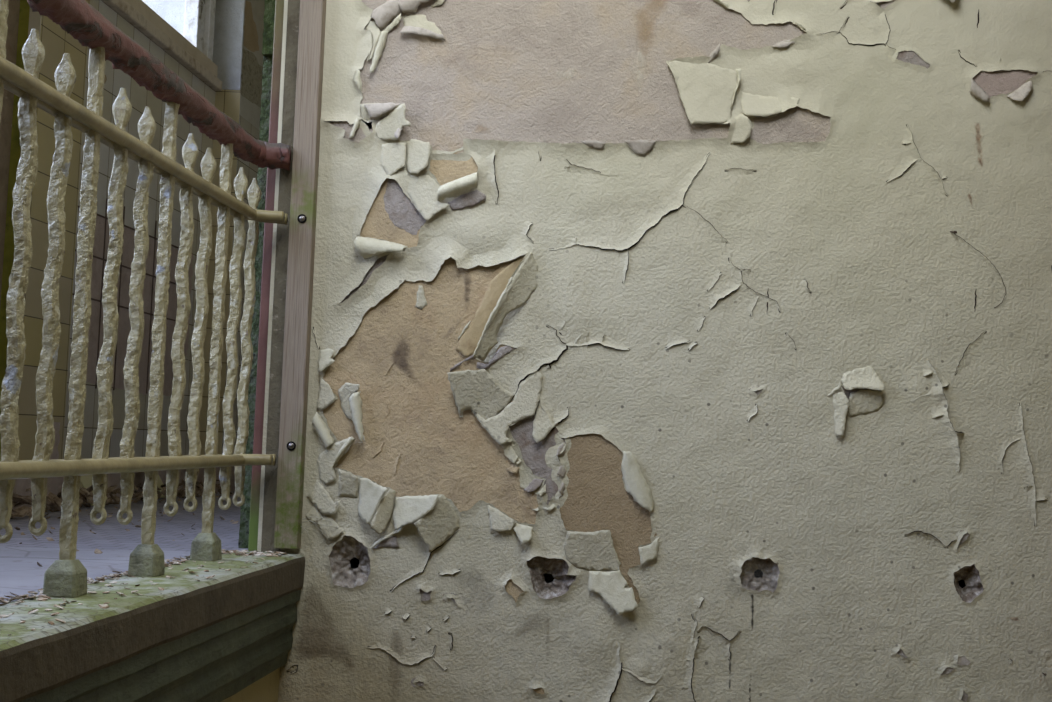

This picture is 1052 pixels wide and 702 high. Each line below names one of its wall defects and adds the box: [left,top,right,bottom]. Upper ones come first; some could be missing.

peeling [962,57,1046,109]
crack [886,124,948,197]
peeling [306,0,843,616]
peeling [828,366,885,437]
crack [911,291,987,472]
crack [991,403,1048,526]
peeling [384,568,465,650]
crack [587,595,741,702]
crack [904,531,957,550]
flaking render [946,527,988,609]